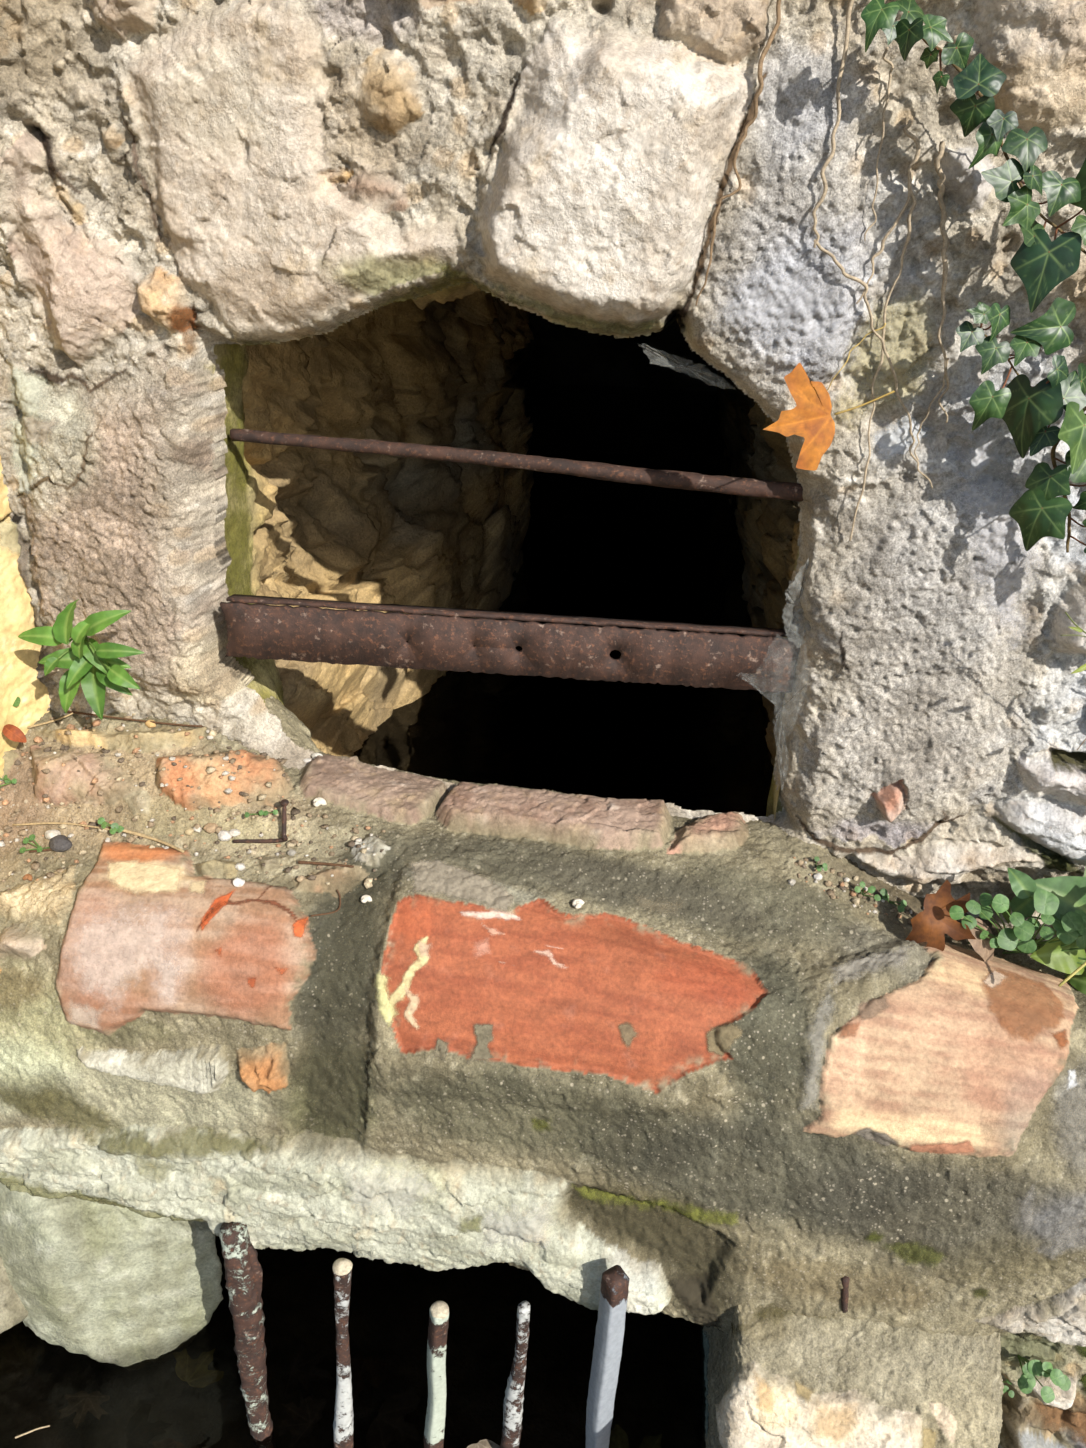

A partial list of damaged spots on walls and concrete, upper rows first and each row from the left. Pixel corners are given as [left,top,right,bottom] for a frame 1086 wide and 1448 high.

crack [489,74,520,154]
spalling [190,877,245,930]
spalling [293,918,308,937]
peeling [477,928,499,953]
peeling [706,1022,742,1056]
peeling [840,1024,859,1037]
spalling [855,1128,974,1154]